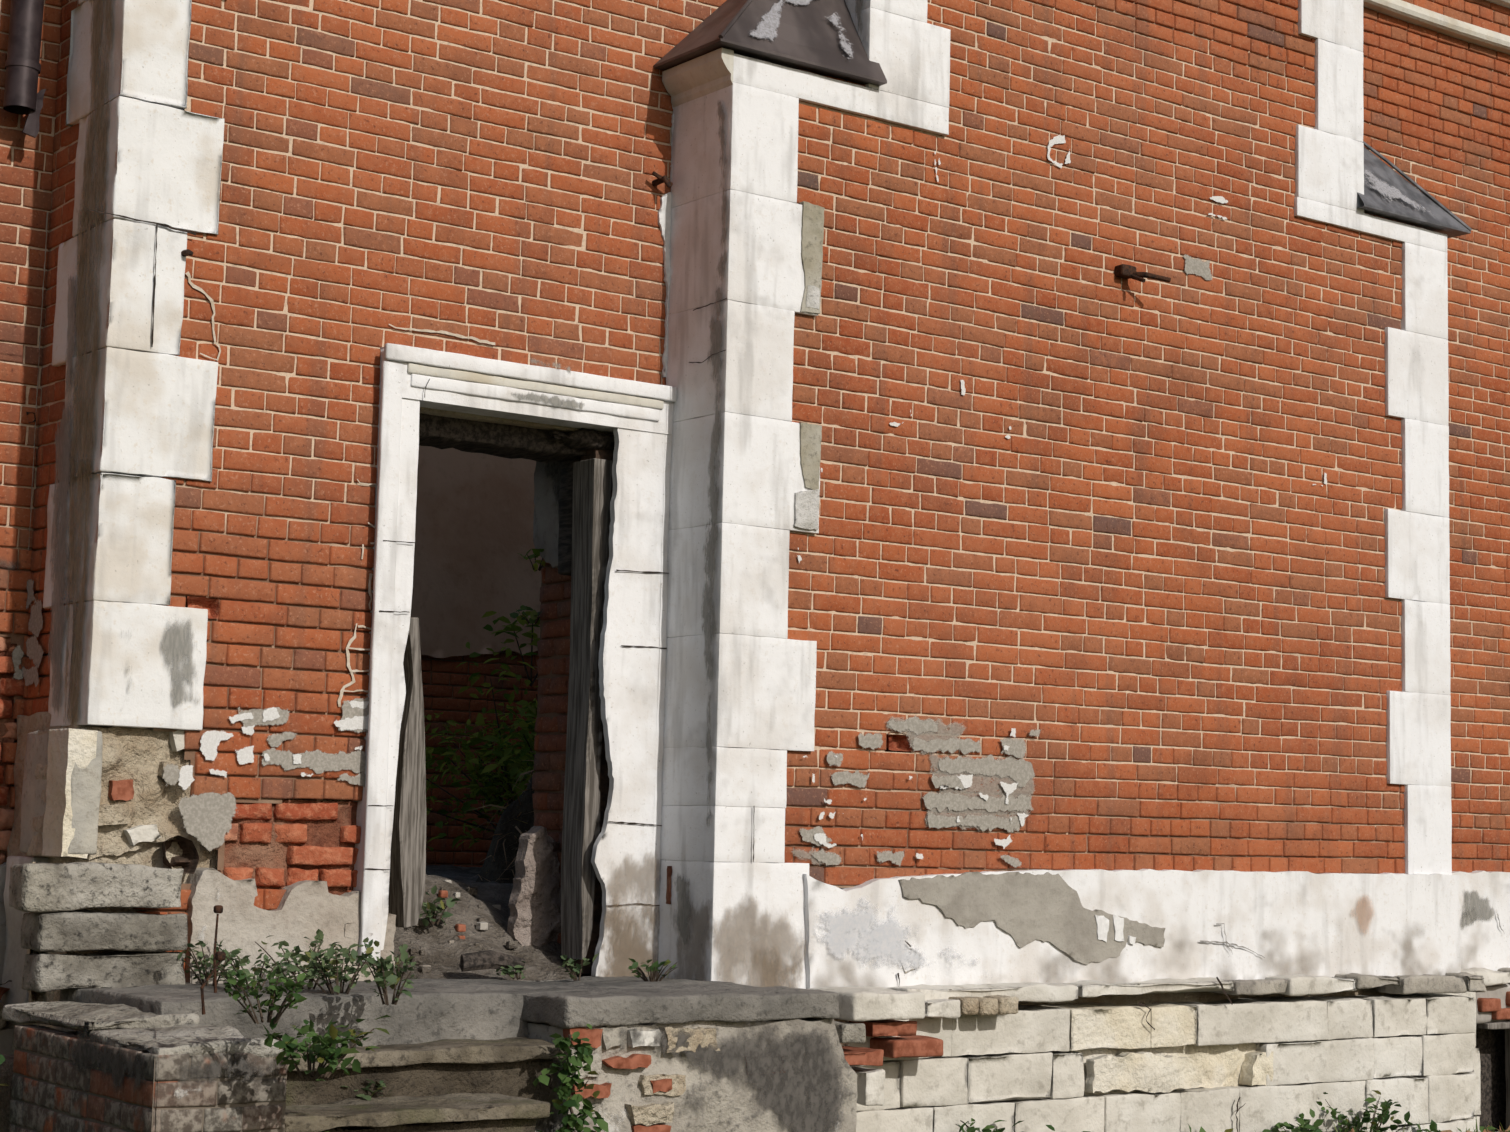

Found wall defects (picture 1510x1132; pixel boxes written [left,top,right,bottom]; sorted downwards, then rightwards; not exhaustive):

damp [702,102,726,825]
damp [162,621,193,706]
hole [886,732,912,751]
spalling [26,701,396,984]
peeling [814,798,837,848]
peeling [940,774,1029,849]
damp [677,875,690,944]
peeling [899,872,1165,965]
spalling [29,990,47,1003]
spalling [563,1026,720,1132]